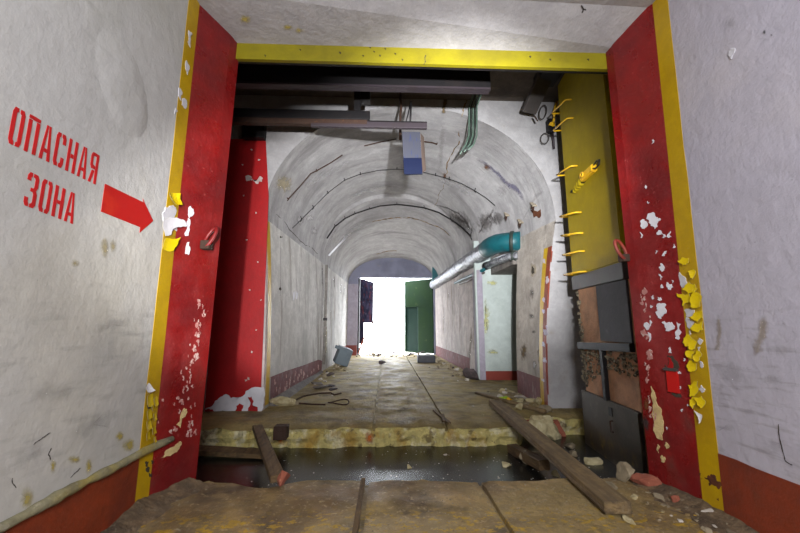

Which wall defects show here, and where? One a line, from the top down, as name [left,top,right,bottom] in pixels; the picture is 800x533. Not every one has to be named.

crack [435,100,467,205]
peeling [162,193,194,255]
peeling [576,201,706,463]
peeling [145,299,206,477]
spalling [204,365,319,412]